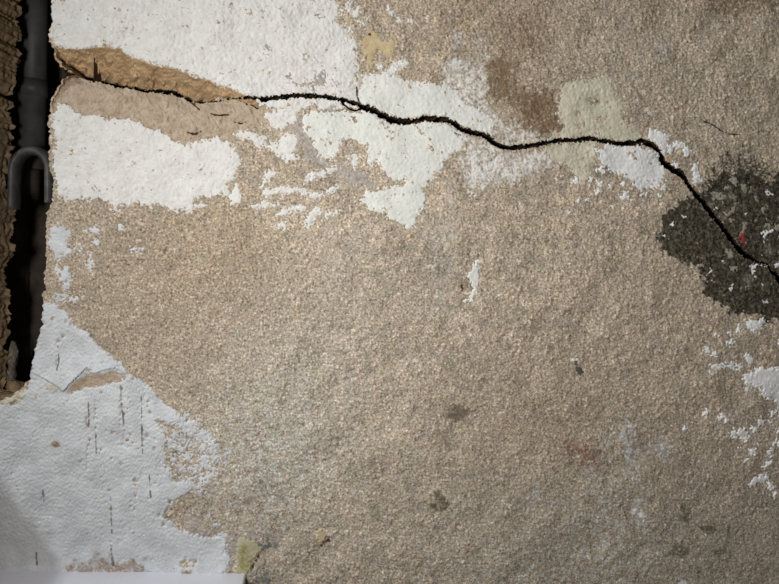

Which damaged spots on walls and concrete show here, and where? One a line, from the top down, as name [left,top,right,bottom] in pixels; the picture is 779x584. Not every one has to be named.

peeling [0,0,569,406]
crack [58,67,779,285]
leakage [655,145,779,324]
peeling [703,346,754,375]
peeling [714,316,769,348]
peeling [702,408,779,499]